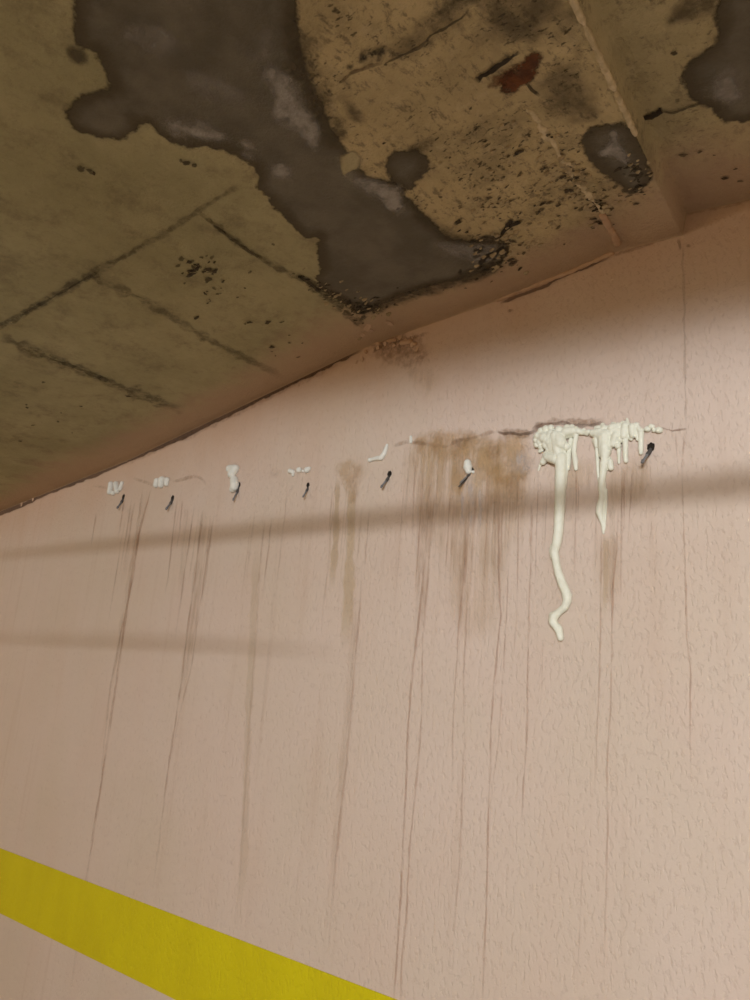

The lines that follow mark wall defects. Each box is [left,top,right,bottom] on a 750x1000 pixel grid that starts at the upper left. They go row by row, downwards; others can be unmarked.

rust [476,52,543,95]
damp [670,0,750,123]
damp [65,0,509,314]
damp [581,122,652,194]